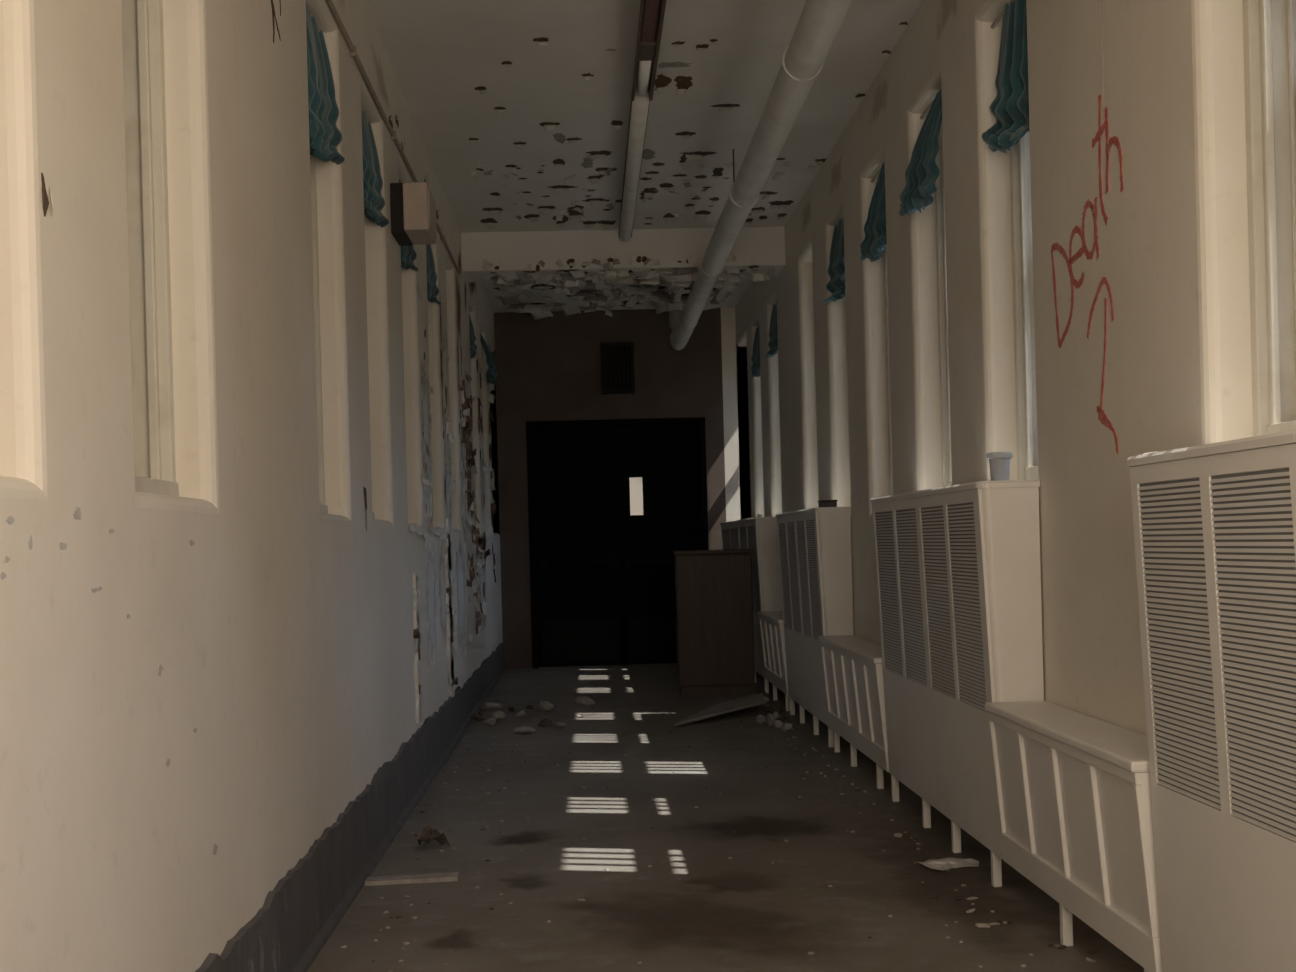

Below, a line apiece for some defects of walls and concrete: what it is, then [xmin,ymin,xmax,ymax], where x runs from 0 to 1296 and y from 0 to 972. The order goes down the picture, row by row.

peeling [654,39,718,95]
peeling [467,122,622,230]
peeling [639,131,736,225]
peeling [745,158,796,225]
peeling [482,255,699,320]
peeling [703,253,775,310]
flaking render [427,325,496,697]